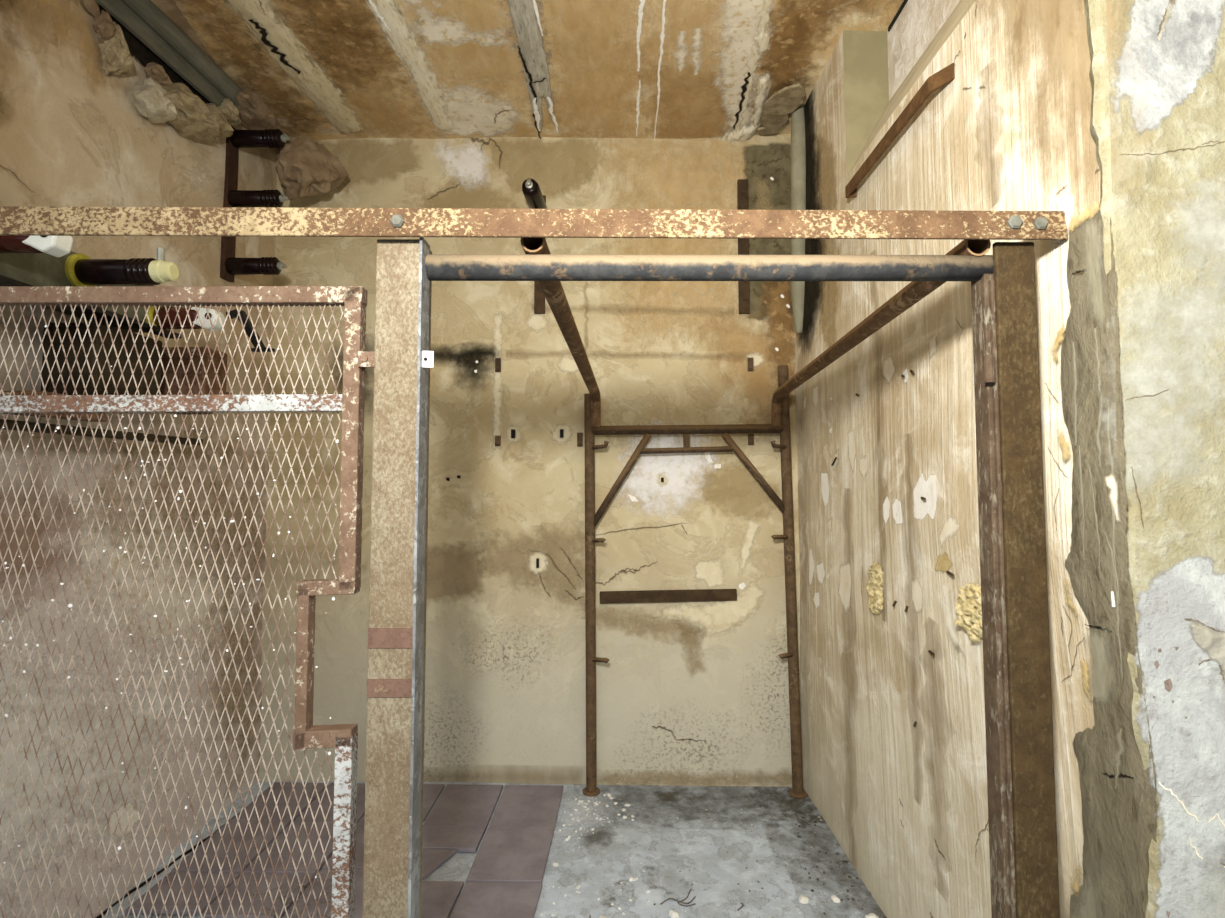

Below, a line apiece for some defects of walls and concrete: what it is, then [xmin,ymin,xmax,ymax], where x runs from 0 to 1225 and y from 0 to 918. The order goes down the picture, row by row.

peeling [1110,0,1225,133]
crack [1095,141,1225,173]
peeling [1068,203,1099,231]
peeling [1106,475,1119,520]
crack [600,523,687,535]
damp [427,536,584,605]
crack [595,561,657,585]
peeling [809,548,825,608]
spalling [839,563,884,614]
spalling [883,472,982,644]
damp [600,610,691,636]
peeling [1134,556,1225,918]